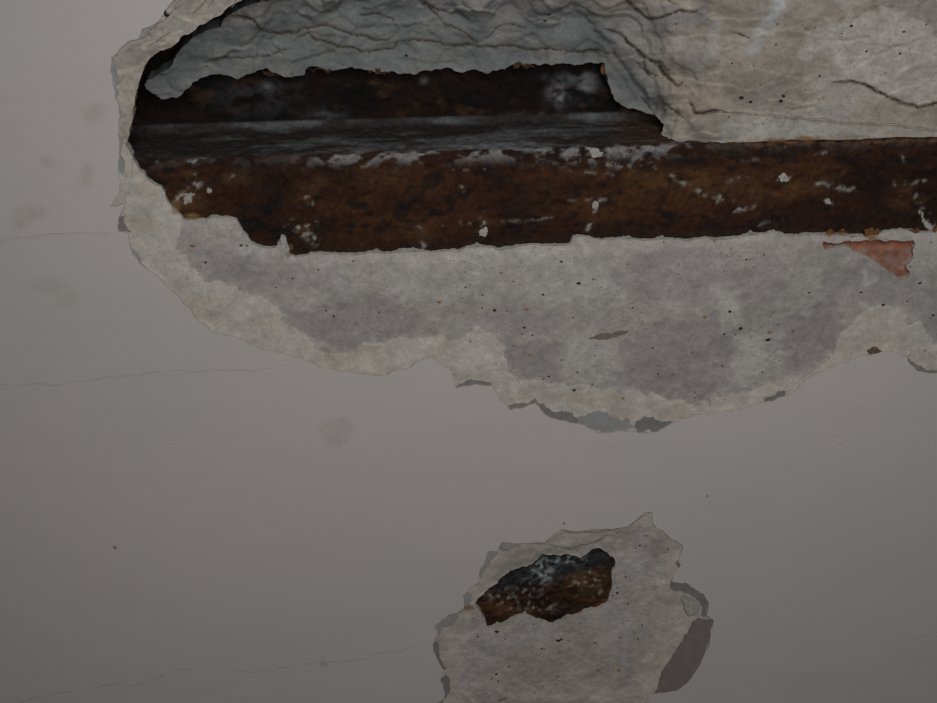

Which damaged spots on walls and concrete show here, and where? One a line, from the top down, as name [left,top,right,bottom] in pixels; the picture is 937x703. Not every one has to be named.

flaking render [111,0,937,433]
rust [464,548,615,626]
flaking render [433,512,713,703]